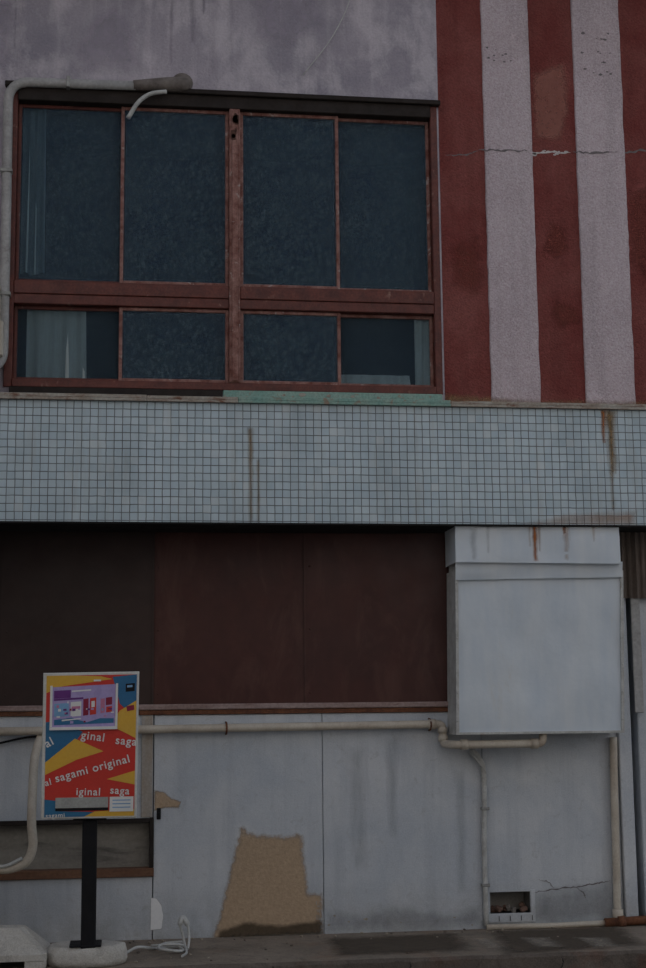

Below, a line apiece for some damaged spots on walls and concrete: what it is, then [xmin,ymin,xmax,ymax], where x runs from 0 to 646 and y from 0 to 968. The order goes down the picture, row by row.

crack [452,148,646,156]
rust [602,411,614,463]
flaking render [215,828,322,937]
crack [535,880,609,898]